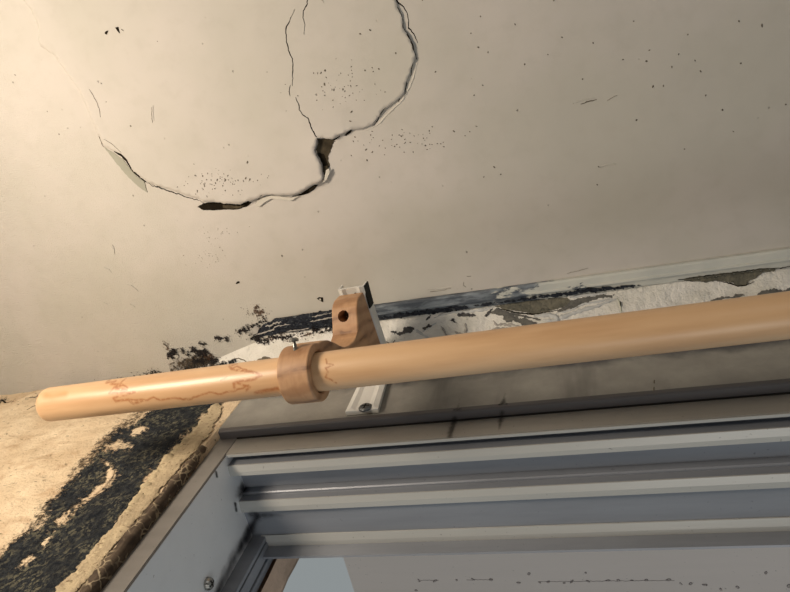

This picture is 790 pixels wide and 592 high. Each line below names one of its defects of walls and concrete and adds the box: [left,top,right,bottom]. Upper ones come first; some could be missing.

crack [285,0,323,140]
crack [368,0,418,130]
crack [99,137,205,205]
spalling [386,292,616,343]
spalling [678,266,790,301]
water stain [130,335,271,376]
water stain [0,402,223,592]